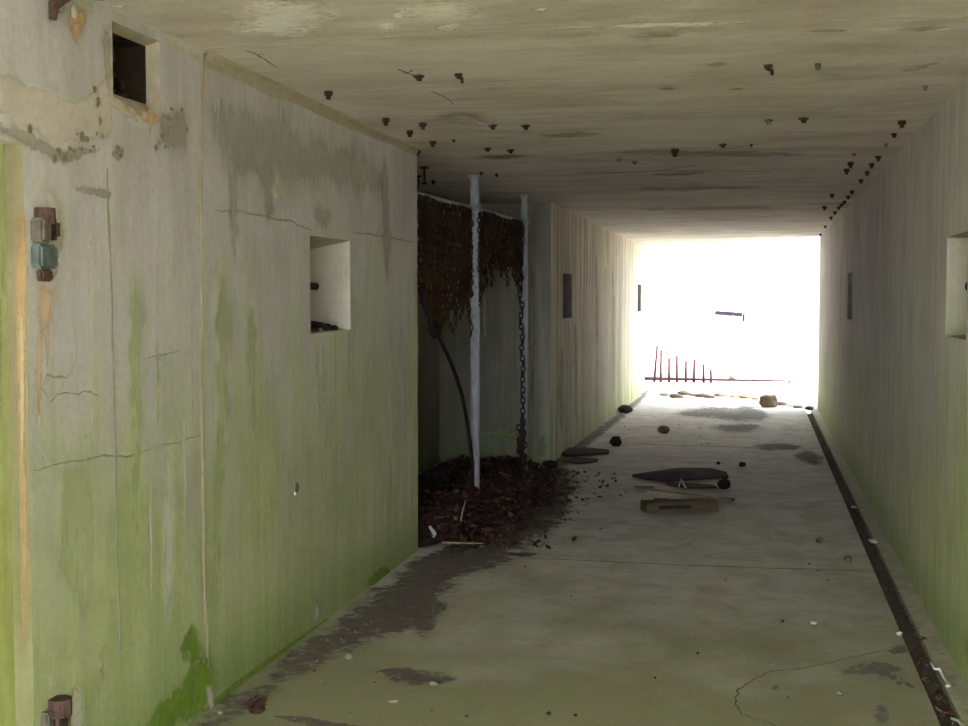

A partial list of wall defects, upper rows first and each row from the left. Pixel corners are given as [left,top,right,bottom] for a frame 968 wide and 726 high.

corrosion [69,5,85,42]
water stain [378,2,474,31]
spalling [154,107,189,151]
crack [214,207,312,231]
crack [40,315,99,403]
crack [33,435,201,472]
water stain [165,428,186,602]
water stain [71,689,83,726]
crack [734,649,892,726]
water stain [839,645,915,689]